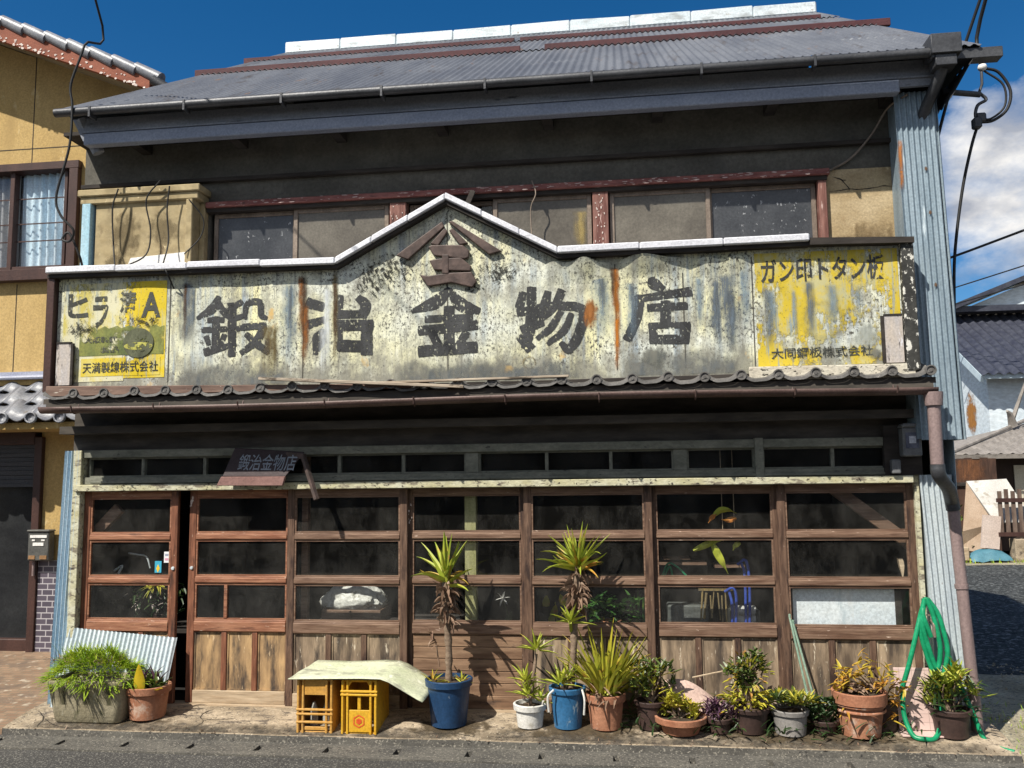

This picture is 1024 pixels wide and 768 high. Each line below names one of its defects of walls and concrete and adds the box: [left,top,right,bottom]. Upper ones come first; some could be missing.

crack [831,176,887,192]
rust [298,278,308,348]
rust [584,300,597,326]
rust [610,269,619,361]
peeling [764,290,775,335]
peeling [792,282,814,324]
peeling [829,286,837,311]
rust [966,394,976,432]